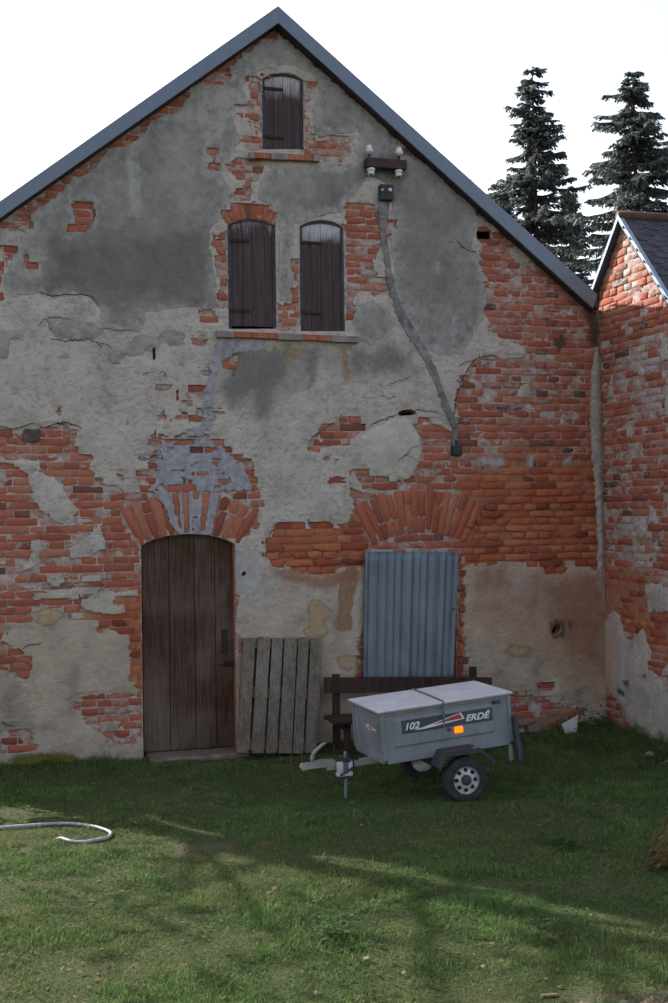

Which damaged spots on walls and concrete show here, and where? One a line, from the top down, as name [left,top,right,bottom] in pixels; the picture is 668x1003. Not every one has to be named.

flaking render [199,30,285,86]
flaking render [301,79,351,166]
flaking render [0,93,189,232]
flaking render [198,74,275,323]
flaking render [0,245,38,302]
peeling [108,329,208,366]
flaking render [222,353,240,377]
flaking render [261,203,601,677]
peeling [635,505,658,537]
flaking render [0,367,265,744]
peeling [645,583,668,613]
flaking render [510,682,584,728]